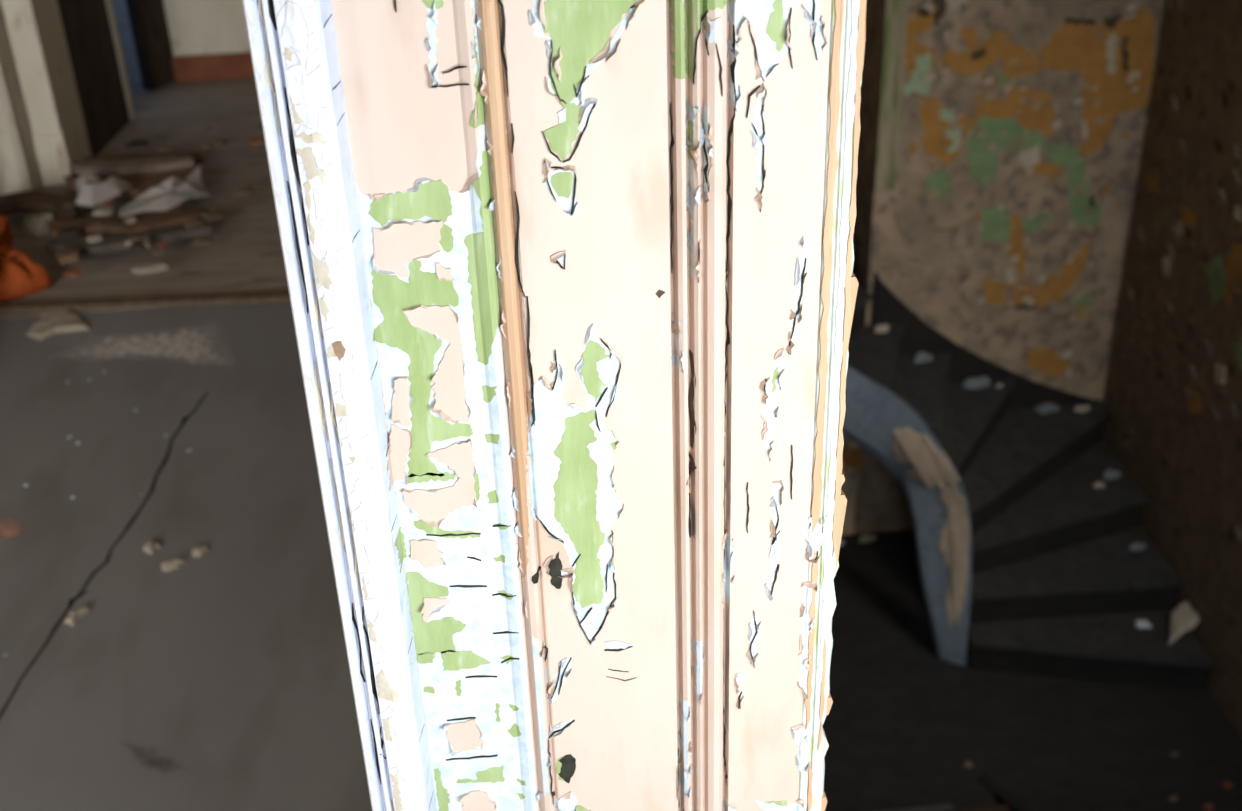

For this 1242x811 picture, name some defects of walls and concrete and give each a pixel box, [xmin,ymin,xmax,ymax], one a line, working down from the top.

peeling [897,0,1157,189]
peeling [290,95,332,323]
peeling [353,0,645,811]
peeling [670,0,867,811]
peeling [977,220,1097,320]
peeling [1019,343,1073,383]
crack [0,392,209,719]
peeling [891,426,970,636]